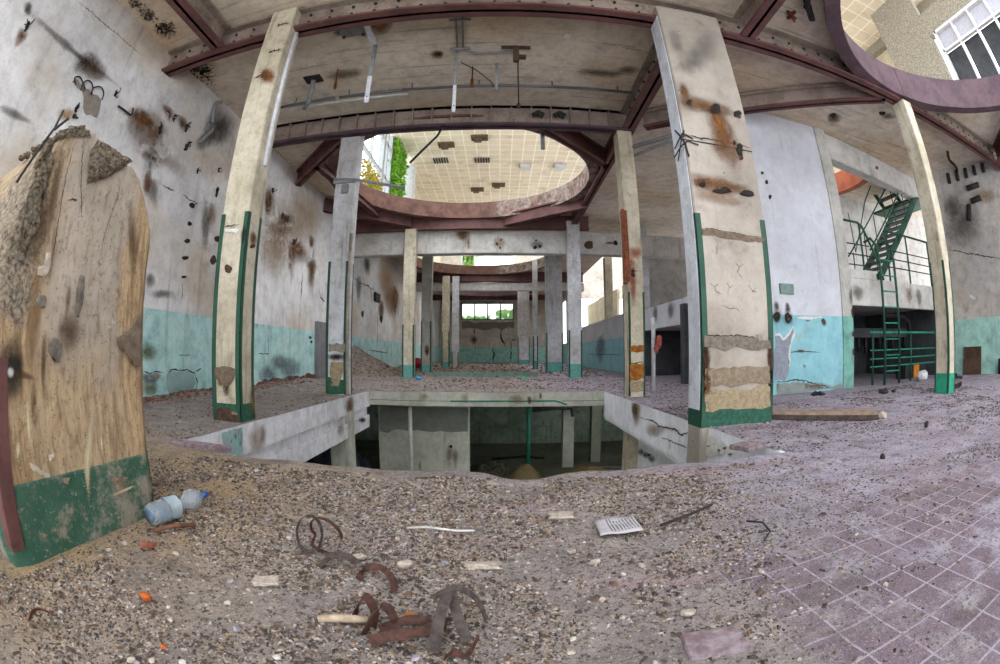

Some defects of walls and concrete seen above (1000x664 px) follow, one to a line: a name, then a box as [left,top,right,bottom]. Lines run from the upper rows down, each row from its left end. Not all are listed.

rust [680,85,738,161]
spalling [16,79,132,257]
rust [696,176,744,199]
spalling [701,228,765,242]
peeling [37,253,51,278]
spalling [67,275,85,318]
spalling [704,316,826,412]
spalling [183,343,370,462]
crack [641,412,688,448]